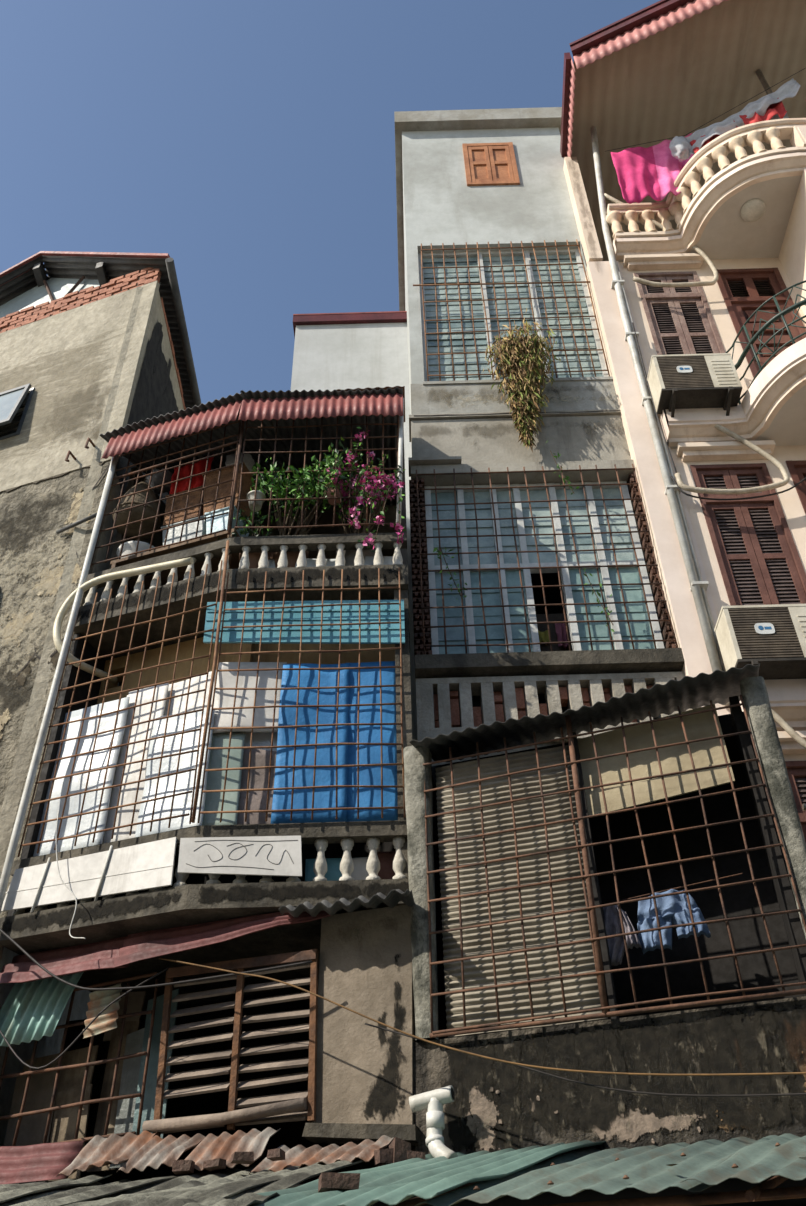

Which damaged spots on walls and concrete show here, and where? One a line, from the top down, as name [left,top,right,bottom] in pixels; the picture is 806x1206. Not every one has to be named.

damp [0,493,67,609]
flaking render [0,708,12,741]
damp [363,954,407,1121]
flaking render [466,1086,503,1151]
damp [441,1003,806,1153]
flaking render [592,1108,752,1144]